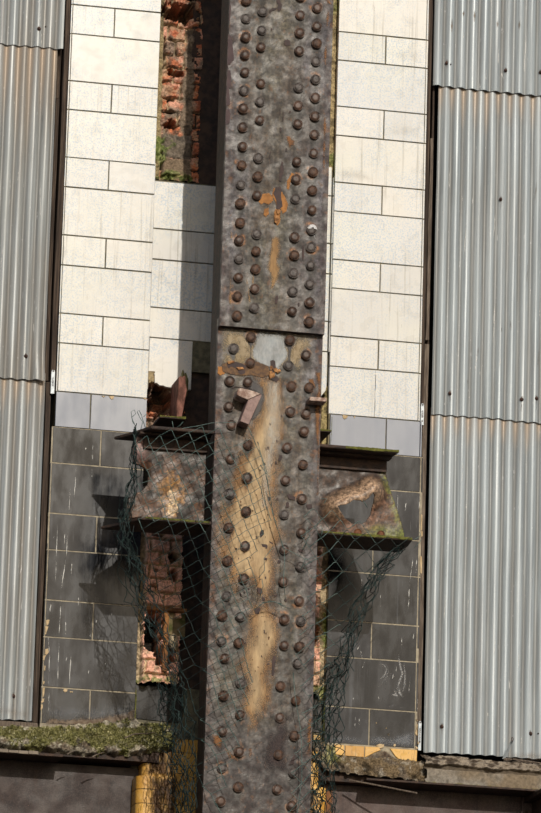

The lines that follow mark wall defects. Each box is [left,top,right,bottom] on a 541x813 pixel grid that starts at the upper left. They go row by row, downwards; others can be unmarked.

spalling [155,0,203,183]
peeling [226,34,234,124]
spalling [329,0,338,171]
corrosion [259,173,294,225]
corrosion [269,238,279,287]
spalling [143,371,171,427]
corrosion [309,373,320,451]
spalling [320,386,328,444]
corrosion [220,379,283,721]
spalling [136,532,184,684]
spalling [313,546,328,701]